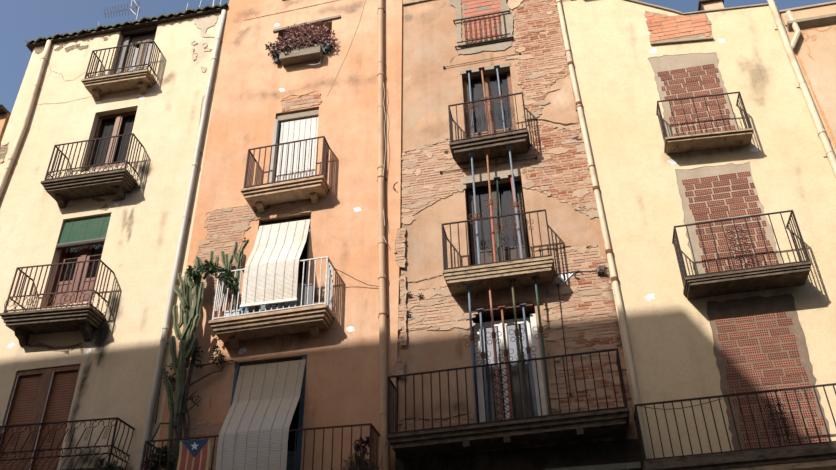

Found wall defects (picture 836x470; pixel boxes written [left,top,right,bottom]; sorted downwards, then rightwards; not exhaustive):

flaking render [0,142,9,163]
flaking render [54,38,90,52]
flaking render [191,41,212,72]
flaking render [281,92,322,111]
flaking render [504,0,599,219]
flaking render [177,202,314,304]
flaking render [394,137,483,346]
leakage [73,297,118,415]